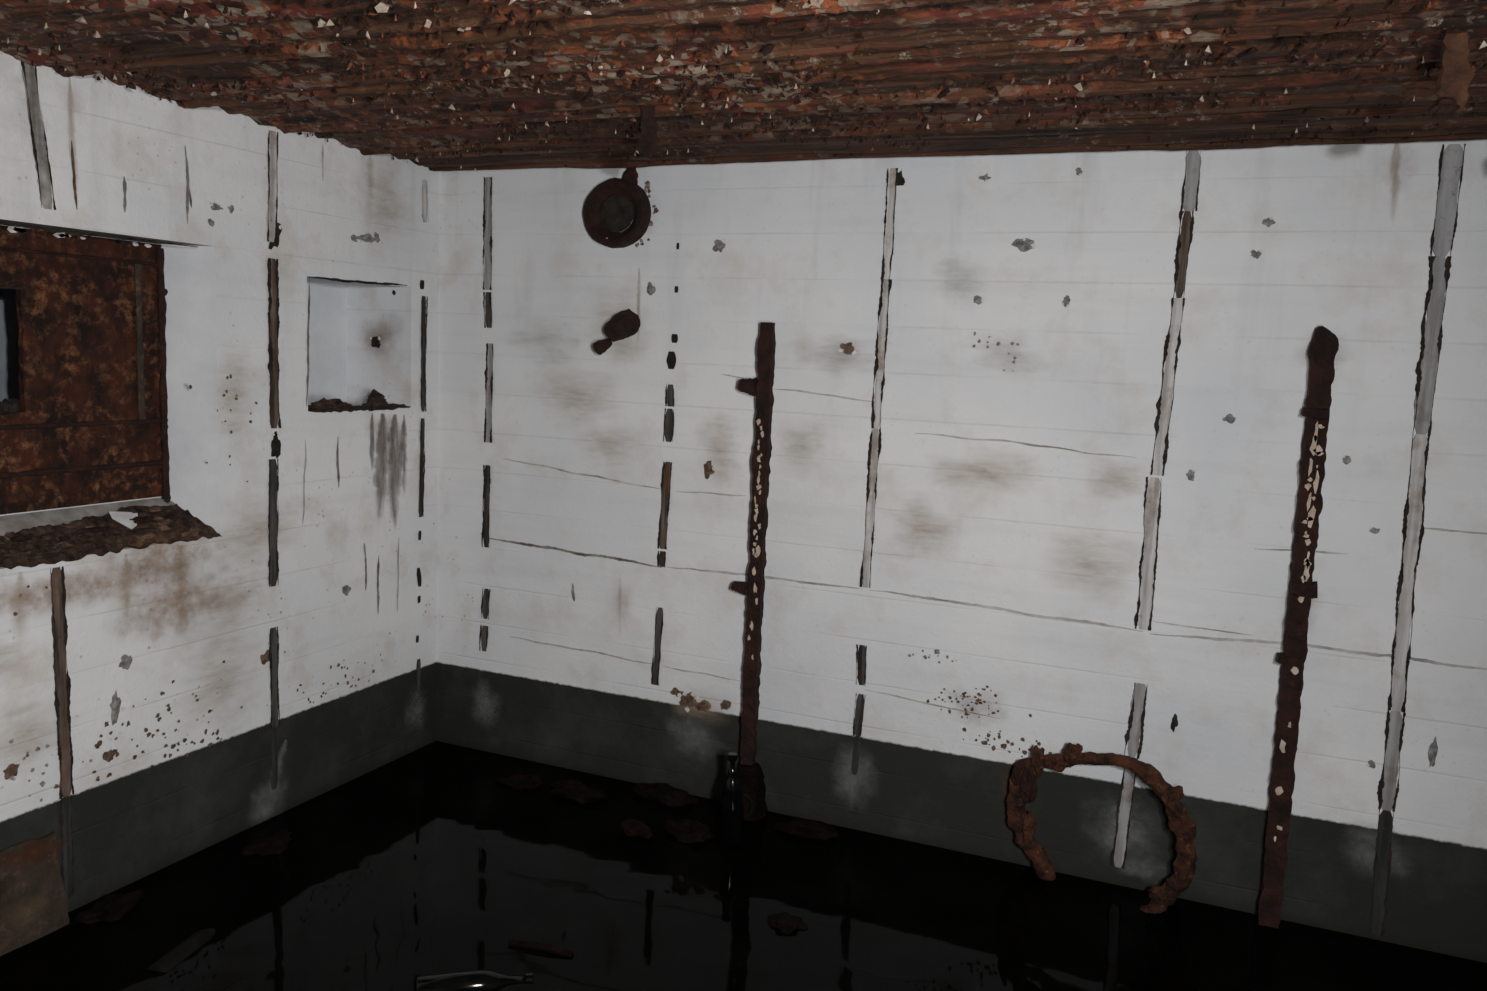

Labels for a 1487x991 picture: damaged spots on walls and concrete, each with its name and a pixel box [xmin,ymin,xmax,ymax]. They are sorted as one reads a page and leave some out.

rust [6,0,1487,247]
damp [370,413,406,518]
rust [926,686,999,718]